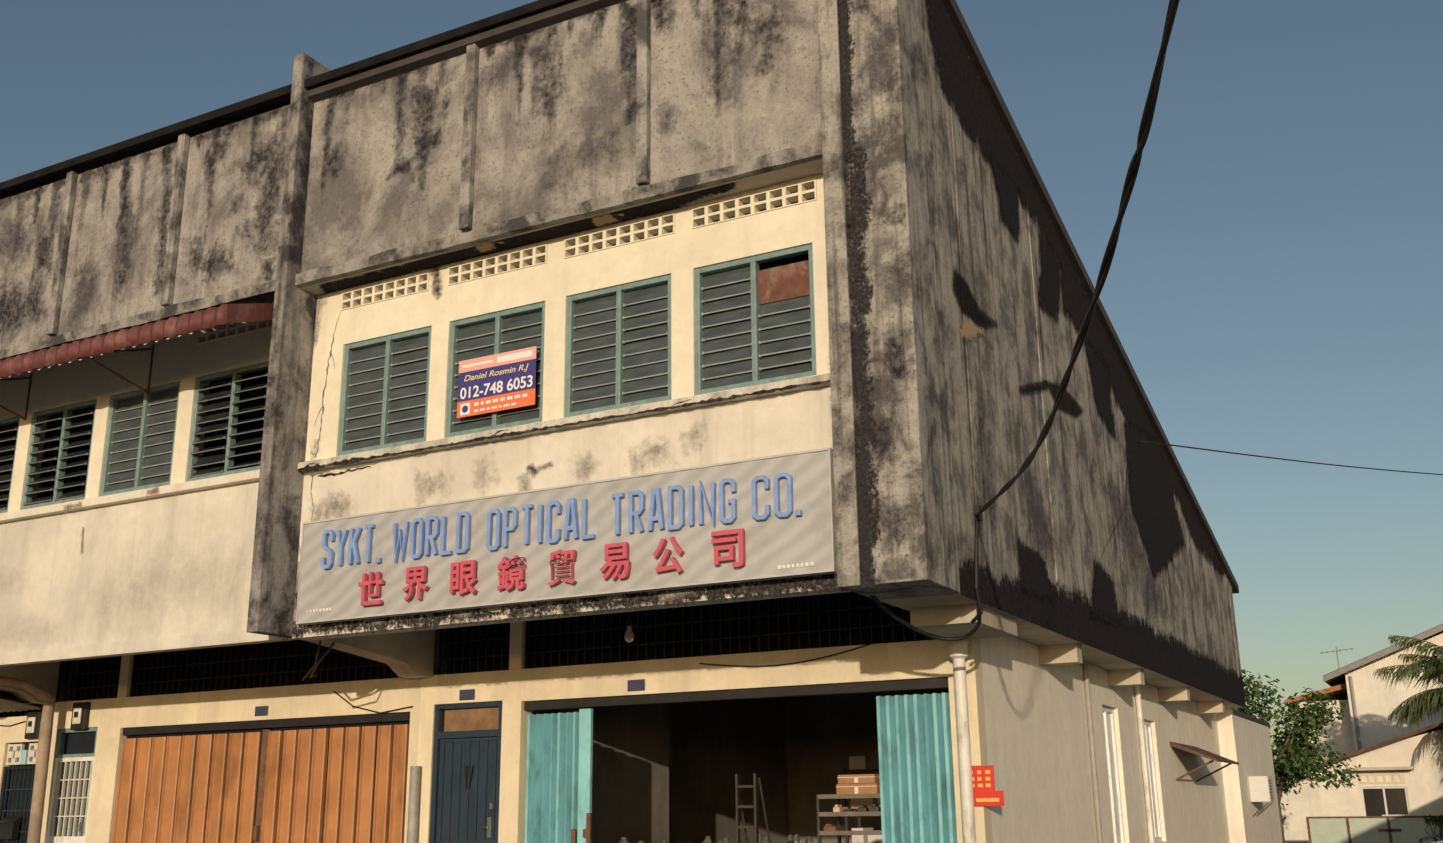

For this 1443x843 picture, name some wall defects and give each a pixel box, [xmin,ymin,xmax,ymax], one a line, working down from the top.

damp [0,146,172,342]
damp [189,90,354,280]
crack [297,312,830,520]
damp [281,0,913,640]
damp [925,0,1246,708]